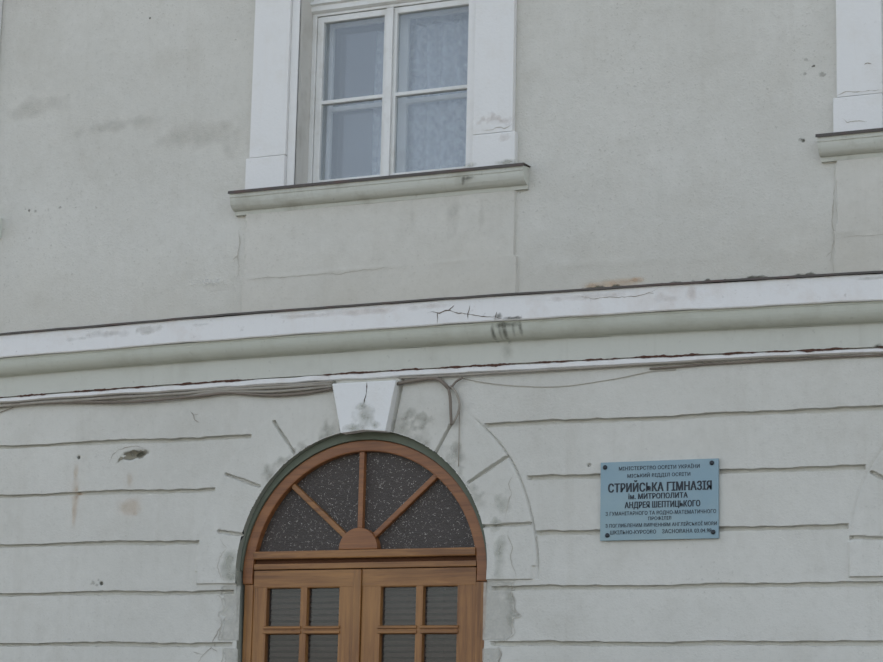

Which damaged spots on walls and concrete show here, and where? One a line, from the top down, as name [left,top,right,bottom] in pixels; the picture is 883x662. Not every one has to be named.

crack [432,306,502,321]
crack [324,347,848,402]
spalling [109,446,147,463]